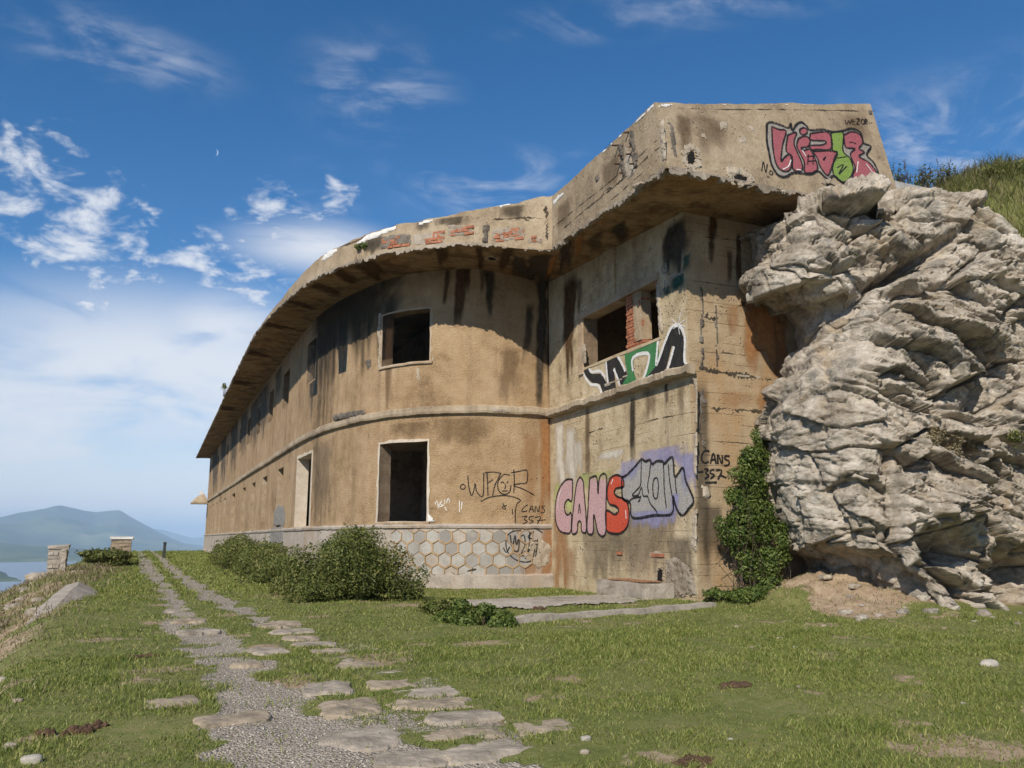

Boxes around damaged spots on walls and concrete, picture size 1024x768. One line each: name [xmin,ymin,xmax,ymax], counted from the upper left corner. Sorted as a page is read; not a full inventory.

leakage [662,219,690,273]
leakage [443,269,494,322]
spalling [196,104,809,458]
leakage [512,240,581,402]
corrosion [745,304,787,370]